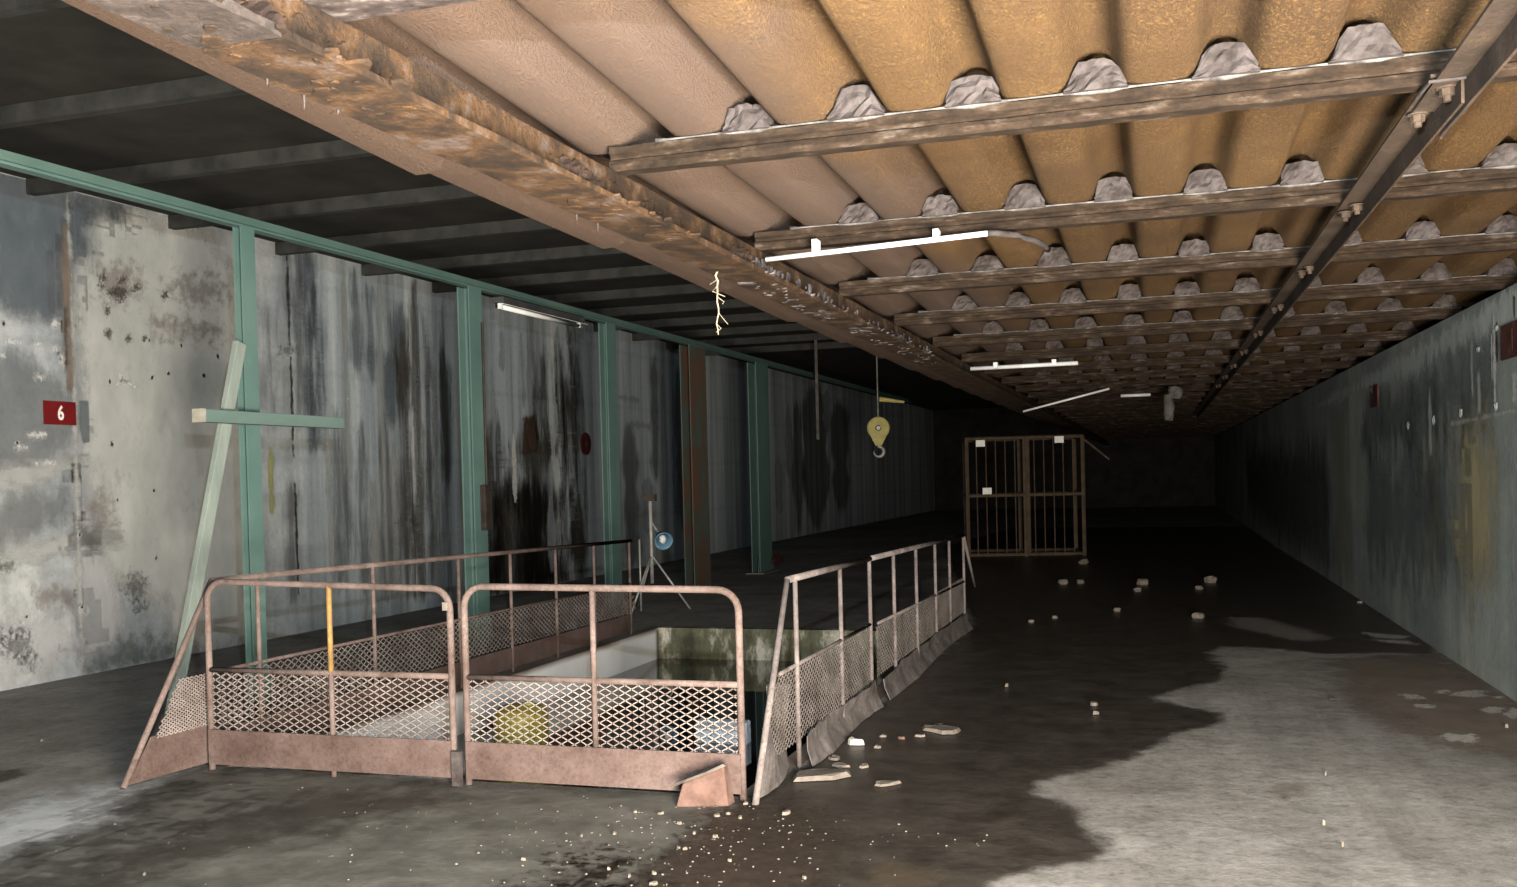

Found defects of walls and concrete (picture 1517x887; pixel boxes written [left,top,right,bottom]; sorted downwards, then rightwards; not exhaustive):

rust [274,12,417,110]
damp [0,173,245,686]
damp [286,253,351,573]
damp [342,271,451,601]
damp [487,321,586,595]
damp [631,379,678,533]
damp [1312,287,1517,575]
damp [0,446,1433,887]